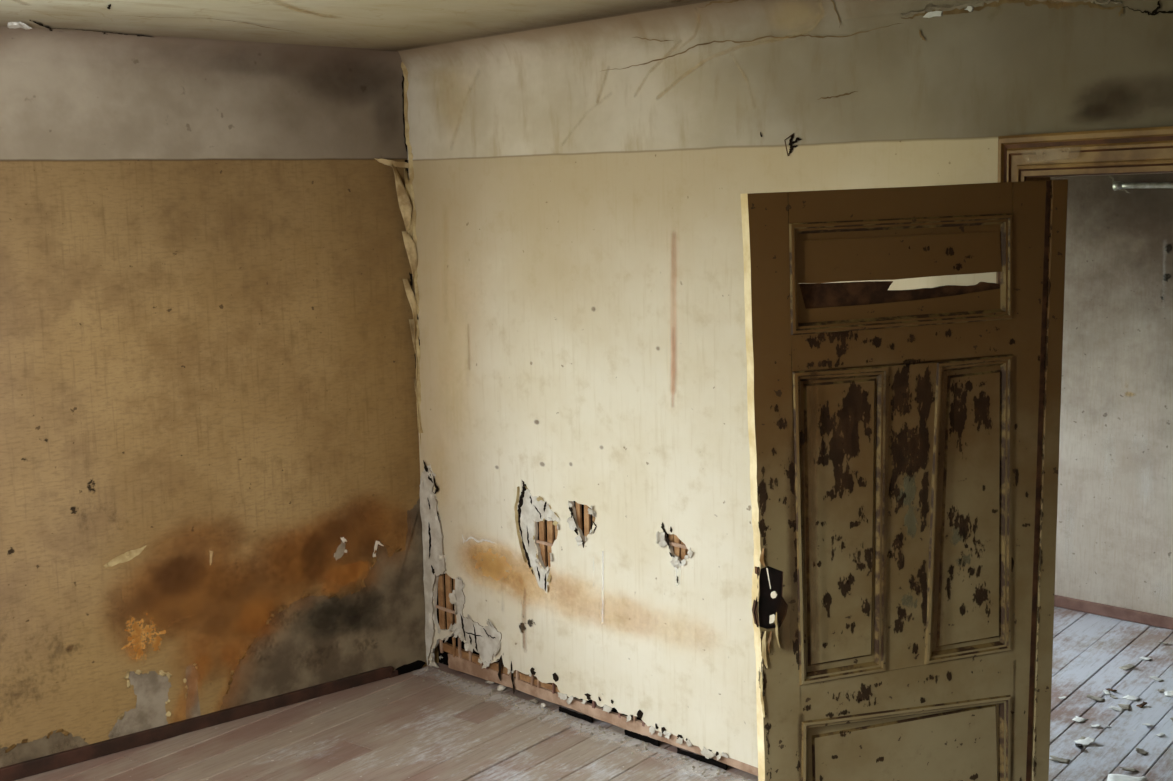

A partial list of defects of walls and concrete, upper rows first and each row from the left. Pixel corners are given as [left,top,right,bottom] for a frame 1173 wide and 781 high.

crack [602,0,1173,71]
water stain [311,595,375,631]
spalling [220,460,772,780]